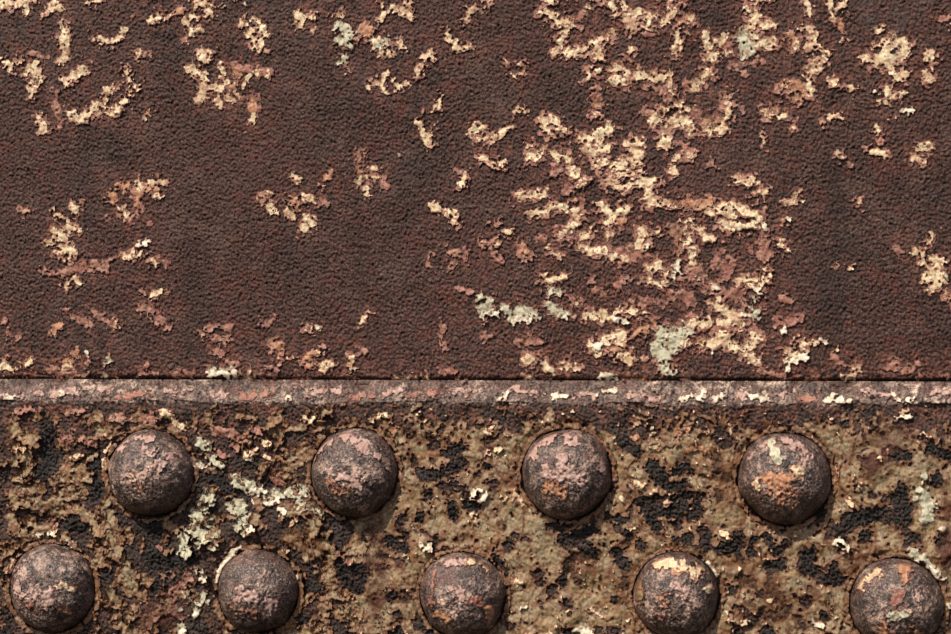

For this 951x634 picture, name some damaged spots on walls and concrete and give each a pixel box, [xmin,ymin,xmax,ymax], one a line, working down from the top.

peeling [0,0,159,141]
peeling [87,0,274,134]
peeling [831,19,943,169]
peeling [37,173,174,339]
peeling [255,167,334,240]
peeling [348,147,391,200]
peeling [427,200,463,231]
corrosion [0,0,951,386]
peeling [454,0,859,381]
peeling [891,227,951,310]
peeling [0,315,951,634]
corrosion [0,400,951,634]